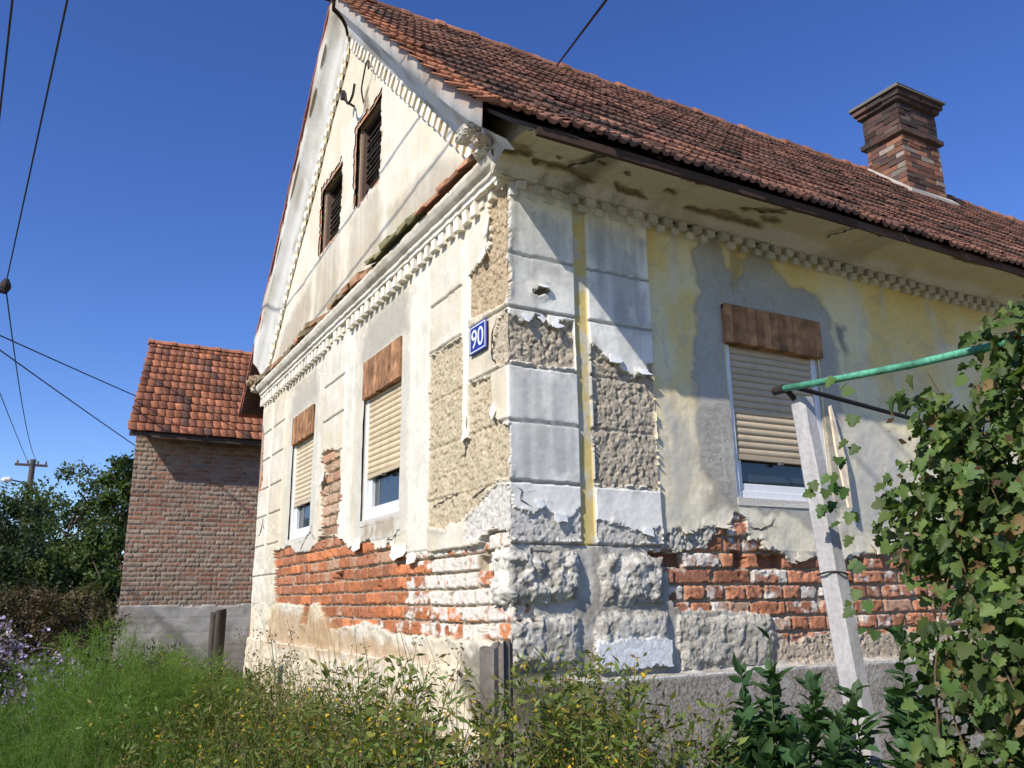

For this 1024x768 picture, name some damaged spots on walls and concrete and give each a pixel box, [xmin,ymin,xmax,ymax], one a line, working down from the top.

flaking render [273,181,582,643]
flaking render [589,343,660,491]
leakage [663,239,902,529]
flaking render [596,512,835,664]
flaking render [842,543,997,659]